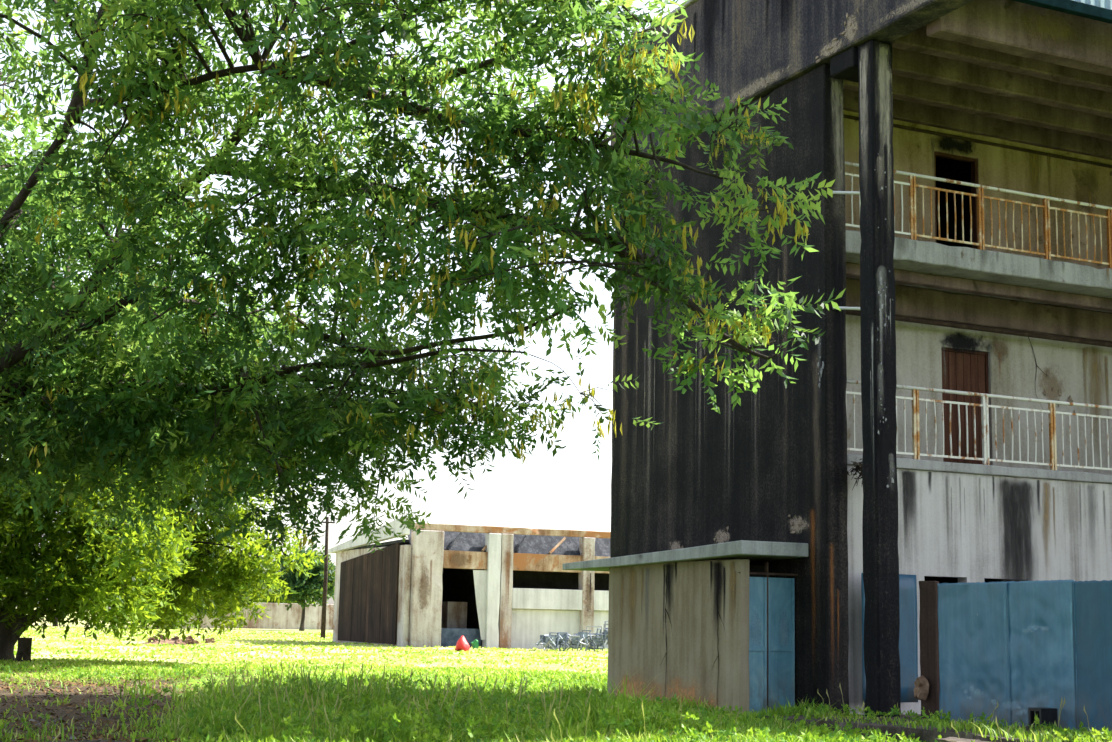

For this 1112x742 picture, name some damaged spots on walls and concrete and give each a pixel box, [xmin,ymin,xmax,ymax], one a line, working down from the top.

leakage [693,0,724,57]
spalling [815,8,859,63]
spalling [788,515,809,534]
leakage [903,472,915,527]
leakage [979,477,1055,582]
leakage [710,561,736,613]